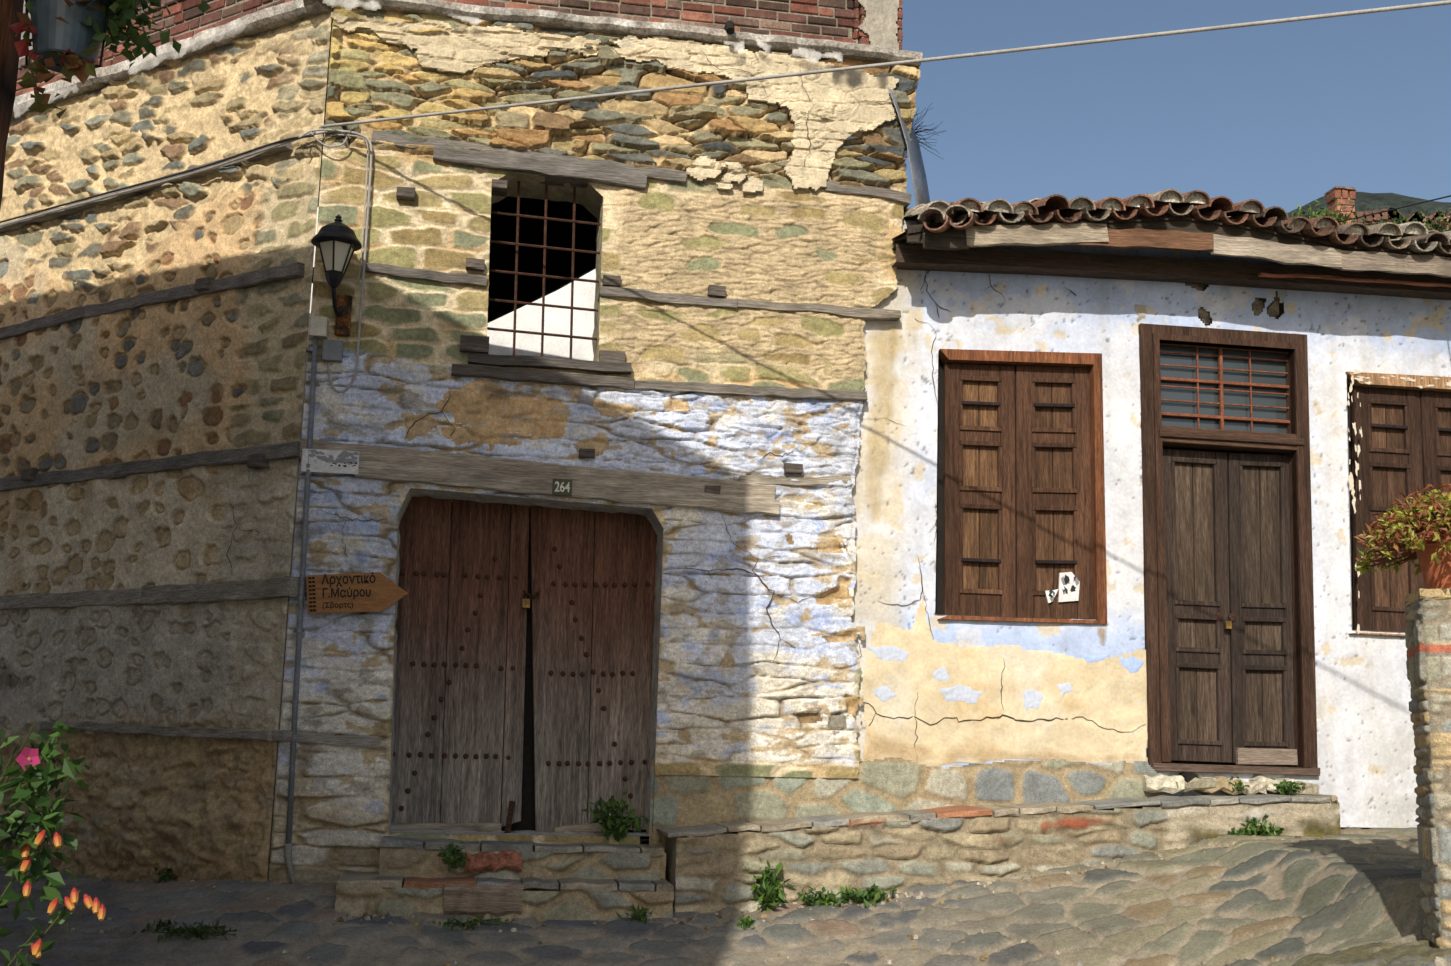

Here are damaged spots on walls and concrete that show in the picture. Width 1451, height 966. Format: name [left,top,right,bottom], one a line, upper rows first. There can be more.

peeling [331,12,899,193]
peeling [401,379,644,456]
peeling [662,397,690,412]
crack [879,505,937,639]
peeling [793,597,1148,767]
crack [859,663,1145,748]